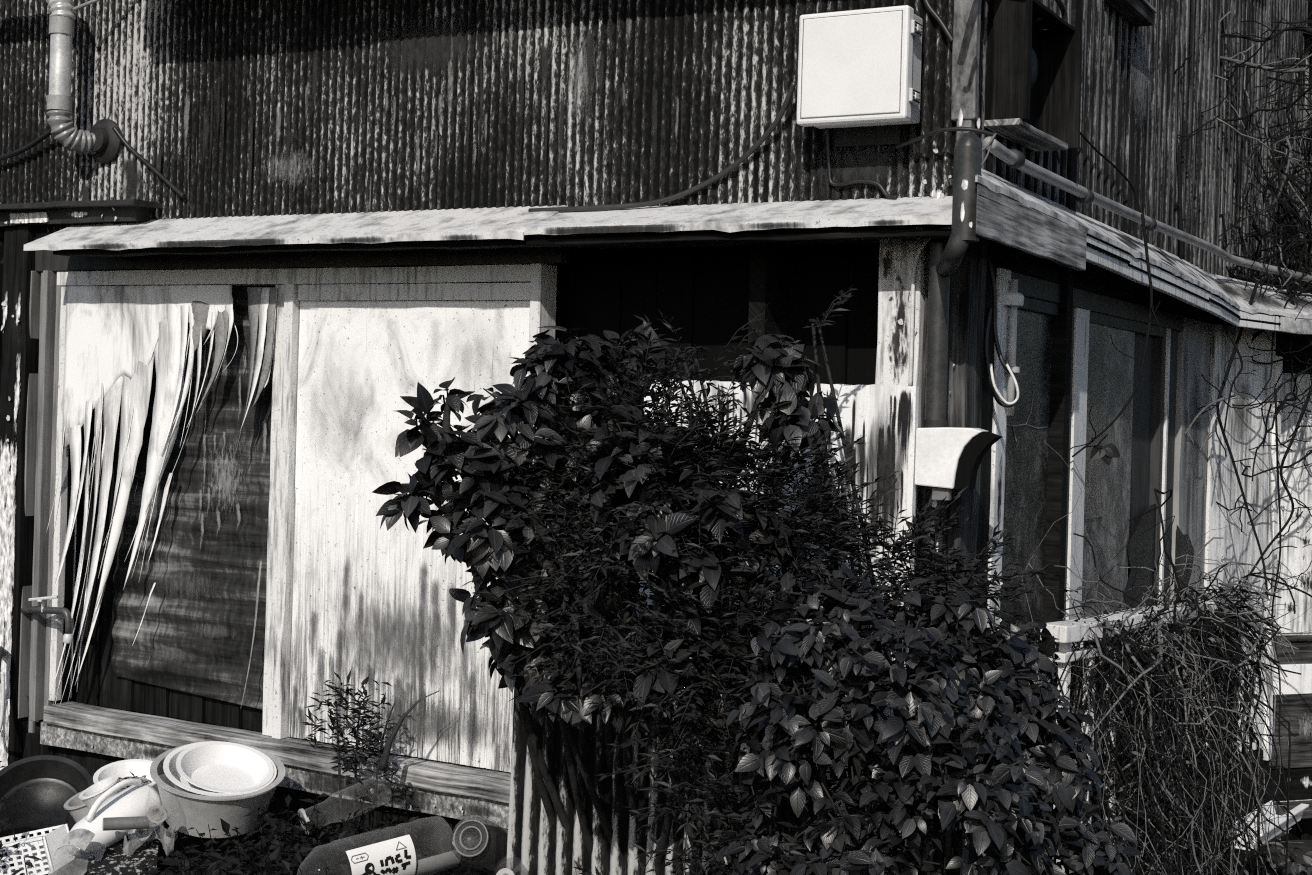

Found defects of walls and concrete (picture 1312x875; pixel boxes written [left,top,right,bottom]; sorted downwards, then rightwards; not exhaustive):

damp [293,685,303,741]
damp [310,560,482,750]